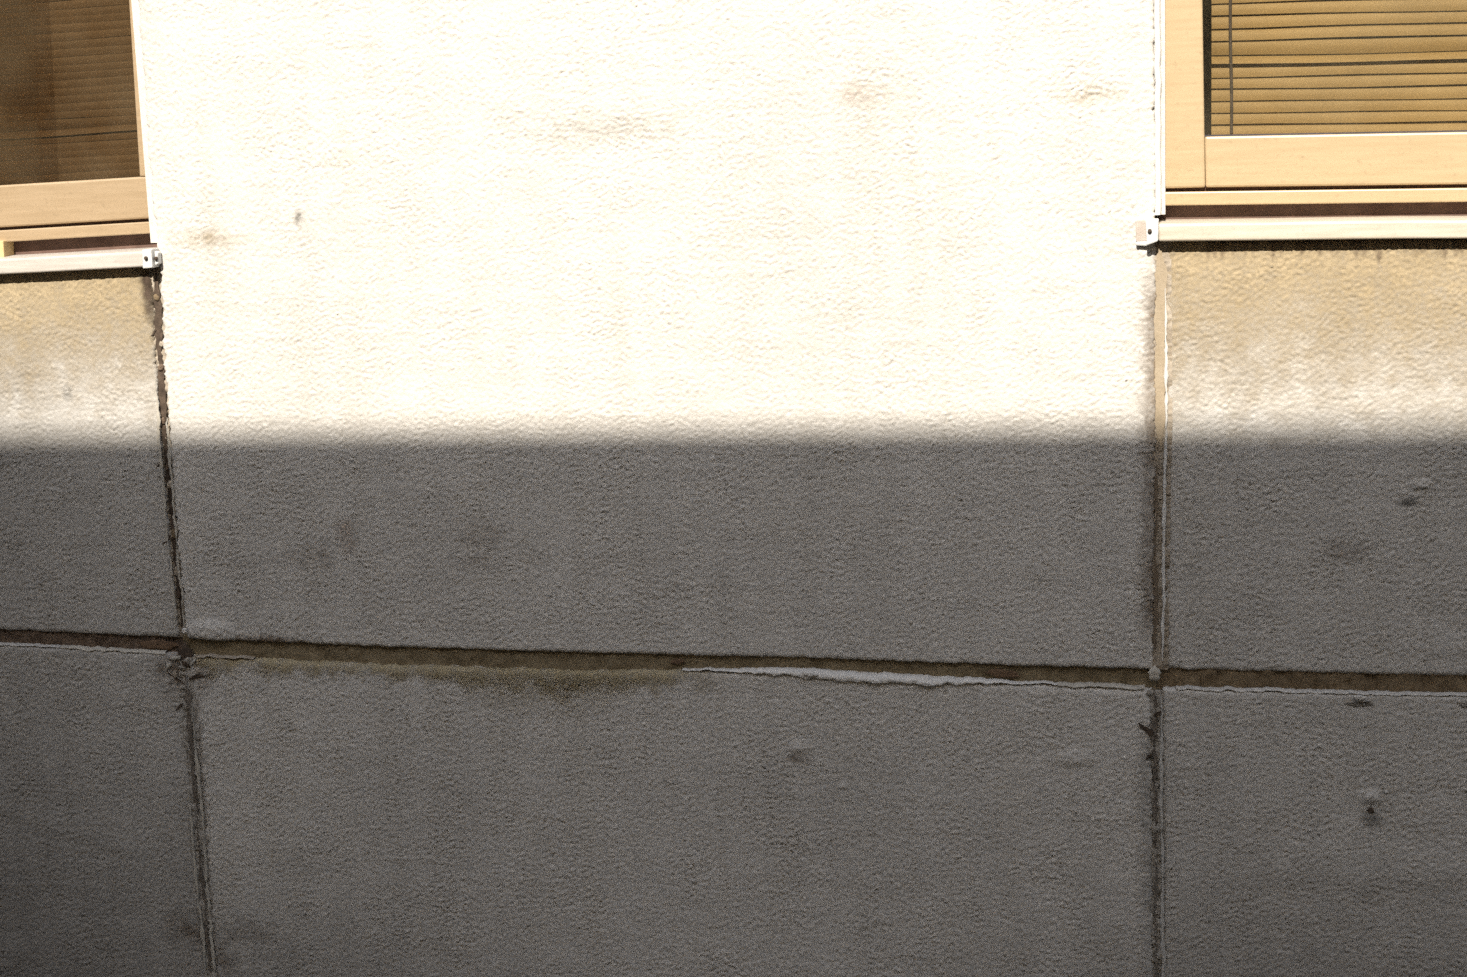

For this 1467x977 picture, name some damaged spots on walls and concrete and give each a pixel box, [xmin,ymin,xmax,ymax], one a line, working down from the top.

leakage [1168,239,1467,365]
leakage [199,656,688,689]